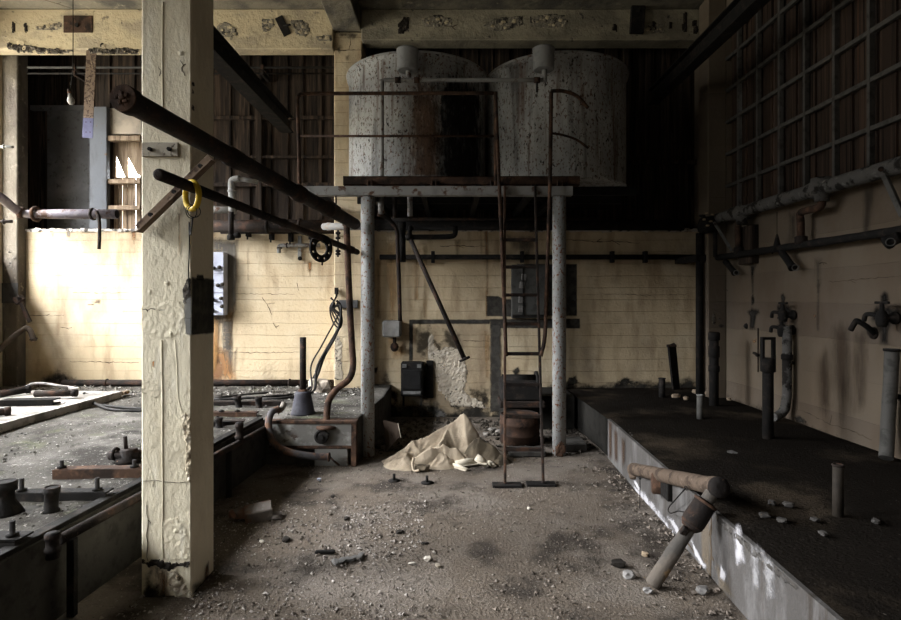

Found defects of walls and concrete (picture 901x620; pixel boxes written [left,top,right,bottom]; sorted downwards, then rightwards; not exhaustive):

spalling [88,43,139,55]
corrosion [213,313,236,380]
spalling [428,334,486,408]
peeling [142,518,194,598]